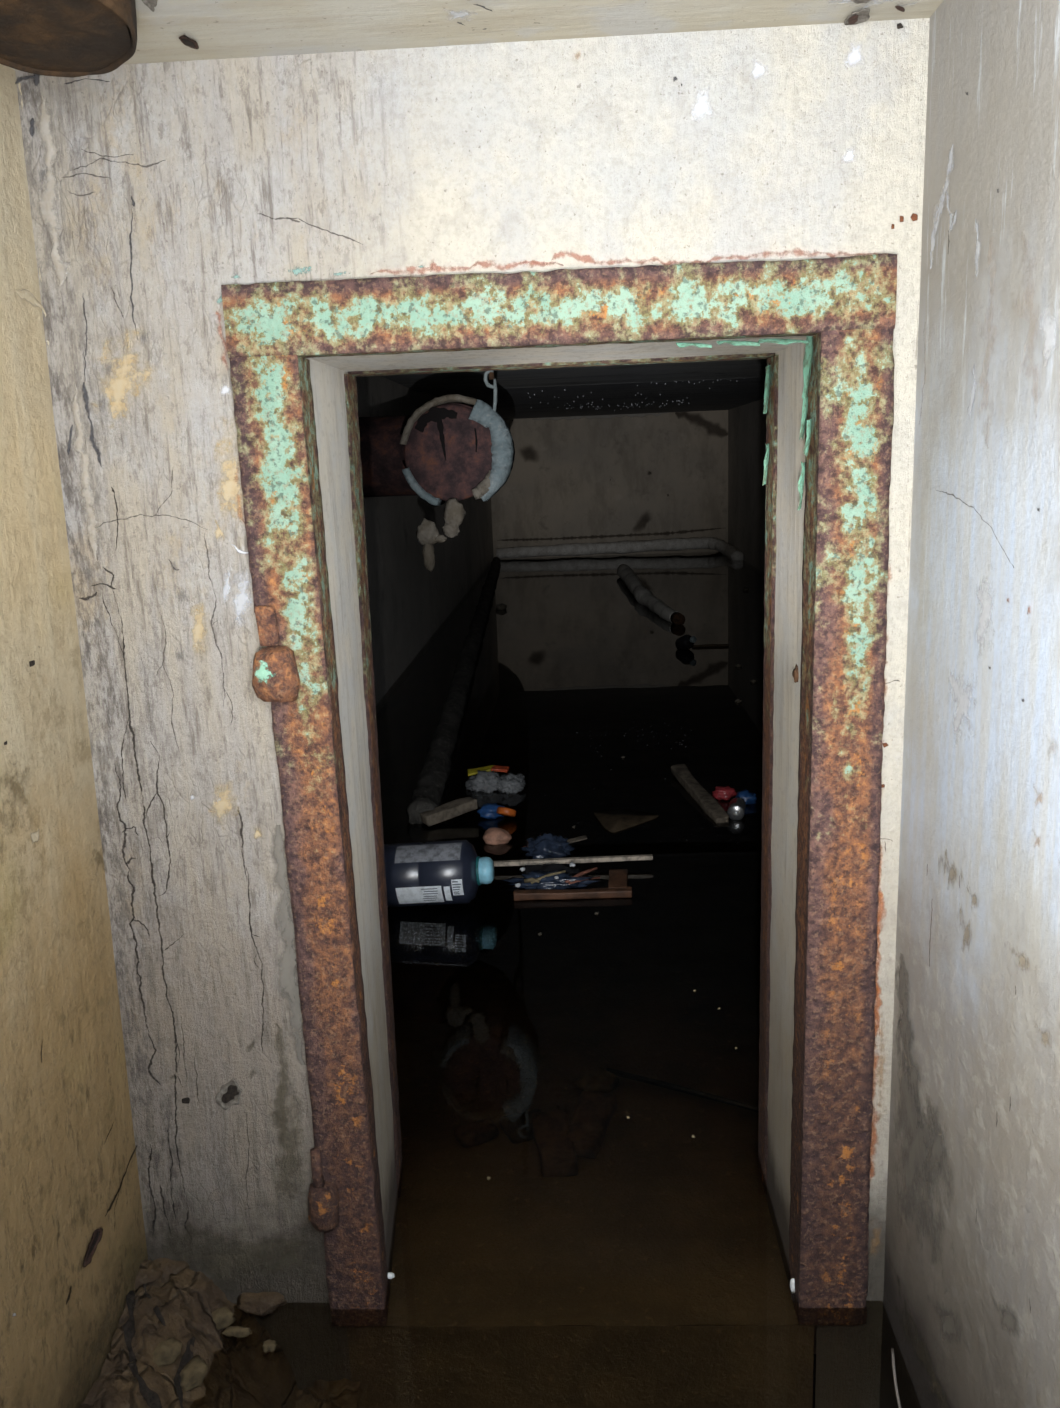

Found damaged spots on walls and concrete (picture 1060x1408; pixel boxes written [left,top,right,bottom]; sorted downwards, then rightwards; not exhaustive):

crack [15,74,110,137]
crack [260,213,361,244]
corrosion [371,250,877,274]
crack [61,149,233,1240]
crack [237,807,264,1052]
corrosion [874,845,884,1036]
crack [245,1113,257,1219]